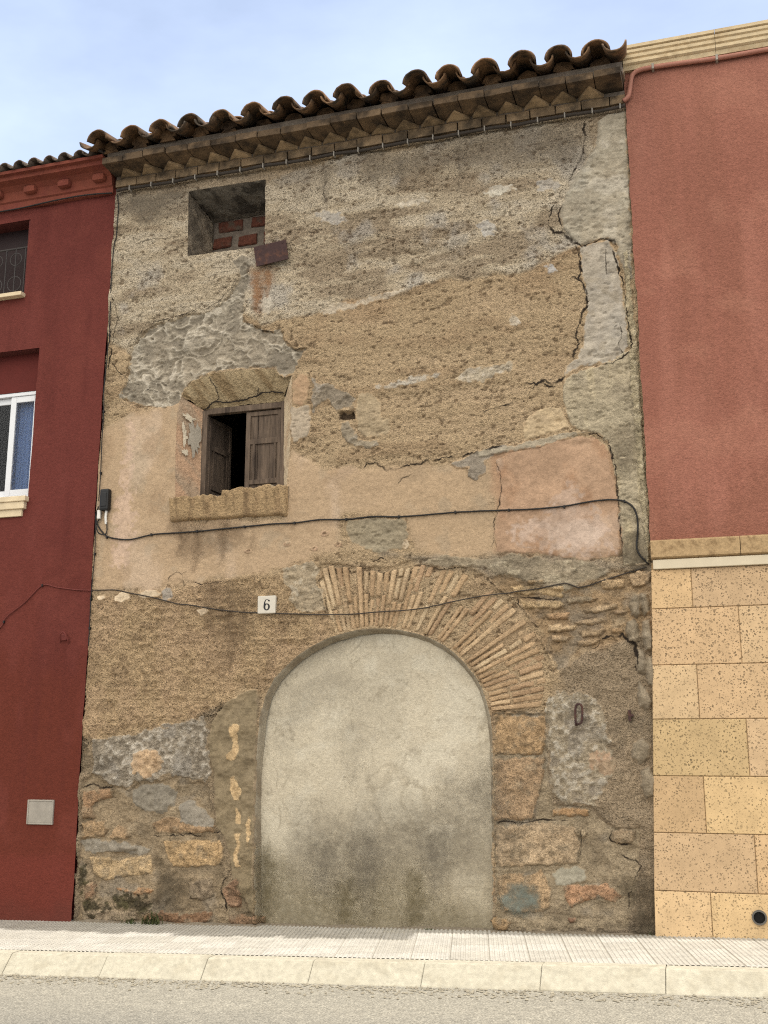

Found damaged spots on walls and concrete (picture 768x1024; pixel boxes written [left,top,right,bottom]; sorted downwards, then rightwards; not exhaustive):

peeling [320,288,406,317]
peeling [543,264,558,275]
crack [527,205,633,388]
spalling [119,269,310,458]
spalling [338,411,356,420]
peeling [372,360,517,390]
crack [365,446,502,544]
spalling [77,716,266,924]